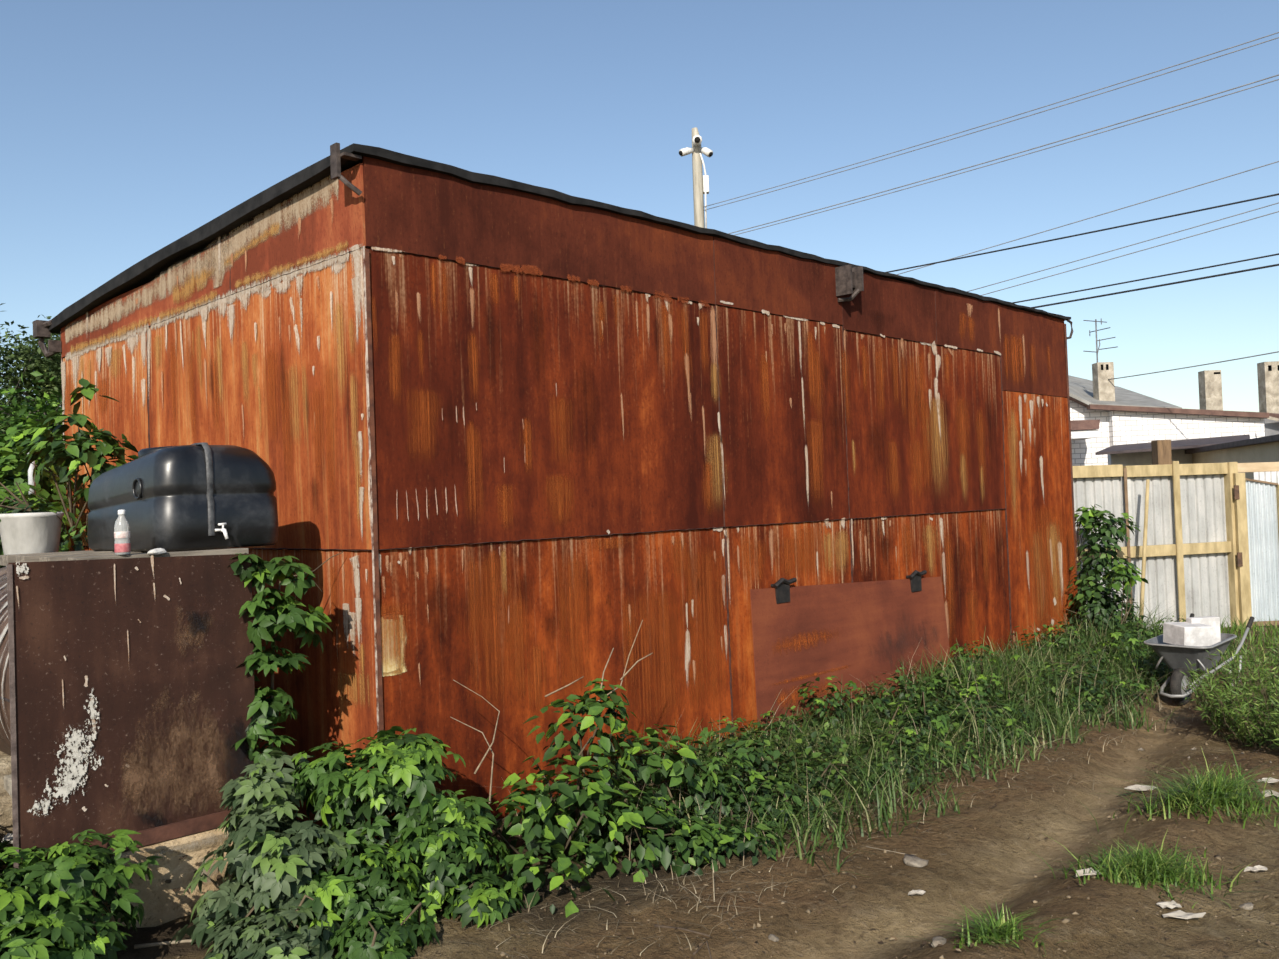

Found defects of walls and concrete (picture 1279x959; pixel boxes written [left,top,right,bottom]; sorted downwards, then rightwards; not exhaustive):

rust [242,276,356,474]
rust [469,267,477,389]
rust [636,294,725,505]
rust [771,321,832,503]
rust [861,334,953,490]
rust [1011,413,1044,505]
rust [331,555,367,701]
rust [624,518,870,713]
rust [926,517,952,632]
rust [1026,512,1074,632]
peeling [27,676,104,817]
rust [123,722,250,827]